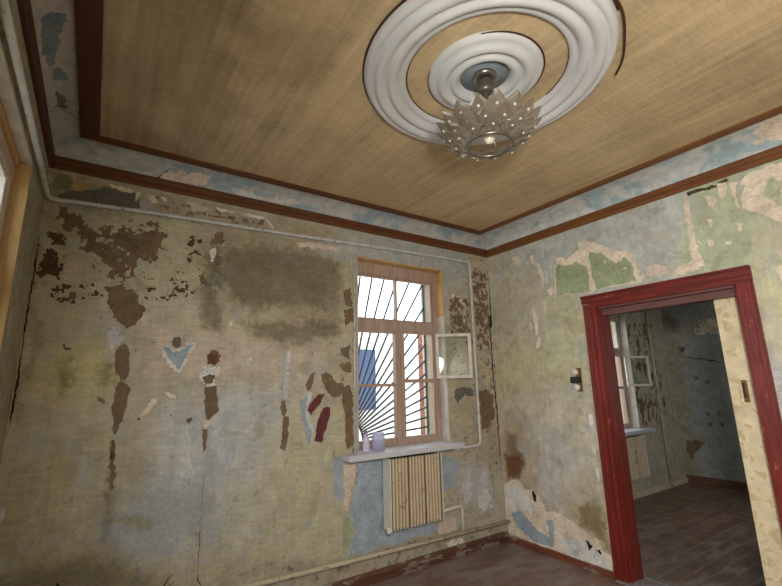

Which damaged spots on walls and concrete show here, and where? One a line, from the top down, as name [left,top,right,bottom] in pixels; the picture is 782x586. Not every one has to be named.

peeling [41,12,69,80]
peeling [36,173,207,329]
peeling [185,231,226,263]
peeling [185,201,274,229]
peeling [509,162,782,297]
peeling [343,288,354,326]
peeling [449,271,490,350]
peeling [339,345,352,373]
peeling [97,344,131,491]
peeling [300,372,354,449]
peeling [454,387,495,430]
flaking render [504,479,613,571]